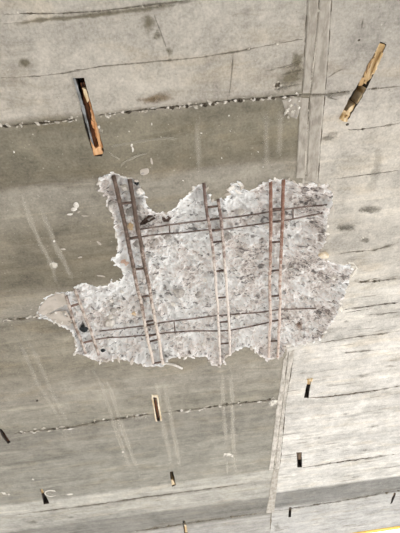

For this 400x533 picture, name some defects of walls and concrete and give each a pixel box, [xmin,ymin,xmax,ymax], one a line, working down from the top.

crack [0,116,77,128]
crack [98,0,399,178]
spalling [35,158,354,368]
crack [15,351,295,473]
crack [303,454,394,468]
crack [309,386,398,398]